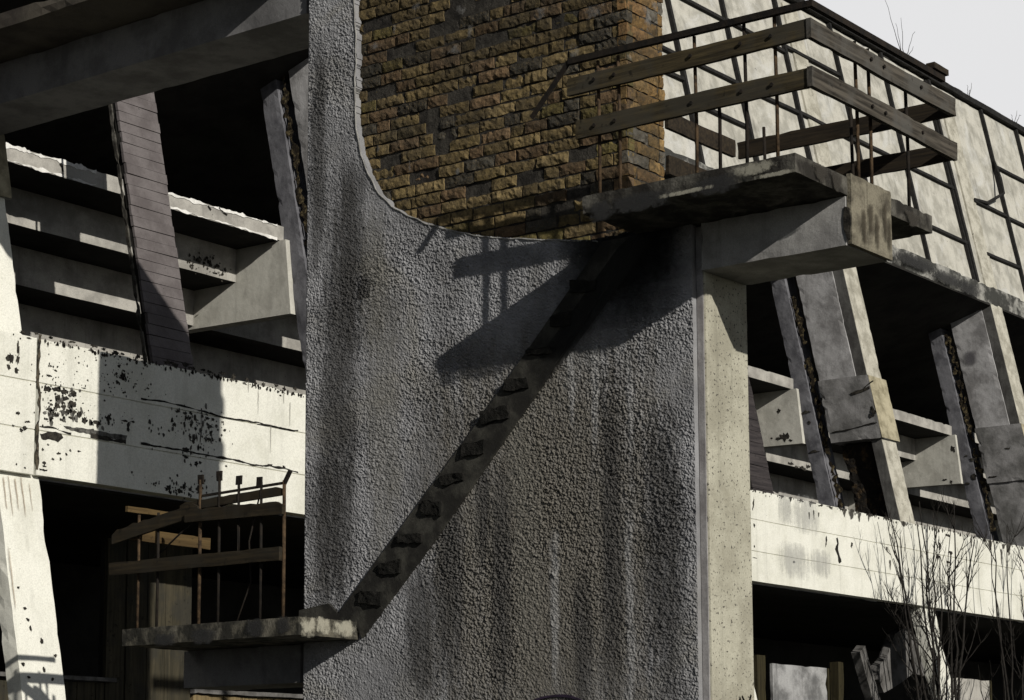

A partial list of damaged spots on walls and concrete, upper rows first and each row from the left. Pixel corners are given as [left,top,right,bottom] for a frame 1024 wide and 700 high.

spalling [790,296,807,345]
peeling [5,330,304,472]
peeling [146,403,233,500]
crack [141,398,298,432]
crack [141,442,298,473]
spalling [752,334,1023,563]